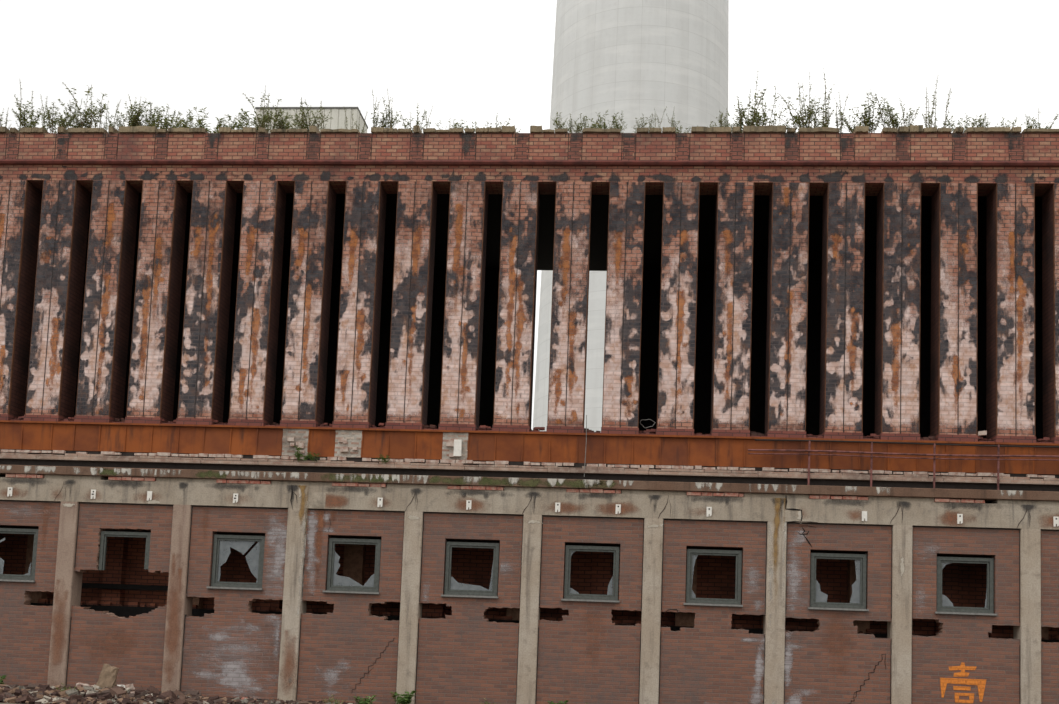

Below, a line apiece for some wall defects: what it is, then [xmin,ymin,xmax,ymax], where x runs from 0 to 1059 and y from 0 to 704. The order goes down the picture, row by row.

leakage [282,255,321,413]
leakage [335,259,371,415]
leakage [387,296,426,416]
leakage [441,242,481,417]
leakage [659,230,697,421]
leakage [713,263,750,423]
leakage [769,304,806,424]
leakage [826,251,863,425]
leakage [882,262,919,426]
leakage [940,241,976,426]
leakage [997,270,1034,428]
crack [352,638,394,690]